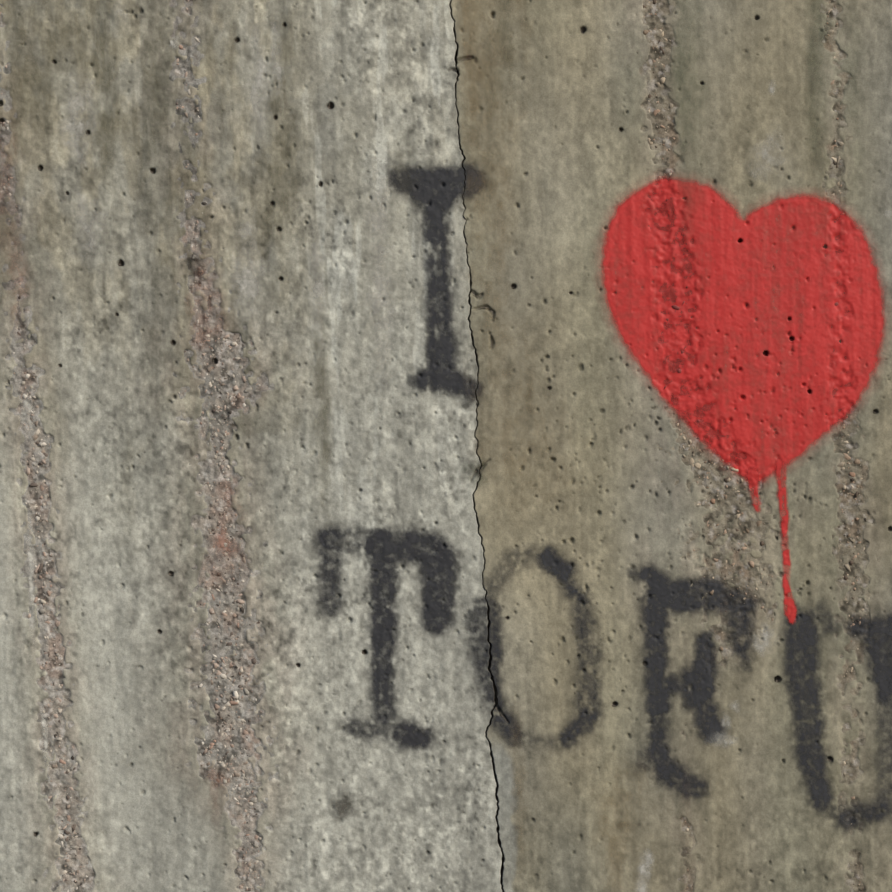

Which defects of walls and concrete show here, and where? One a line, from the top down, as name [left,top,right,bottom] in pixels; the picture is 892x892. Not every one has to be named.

crack [449,0,507,892]